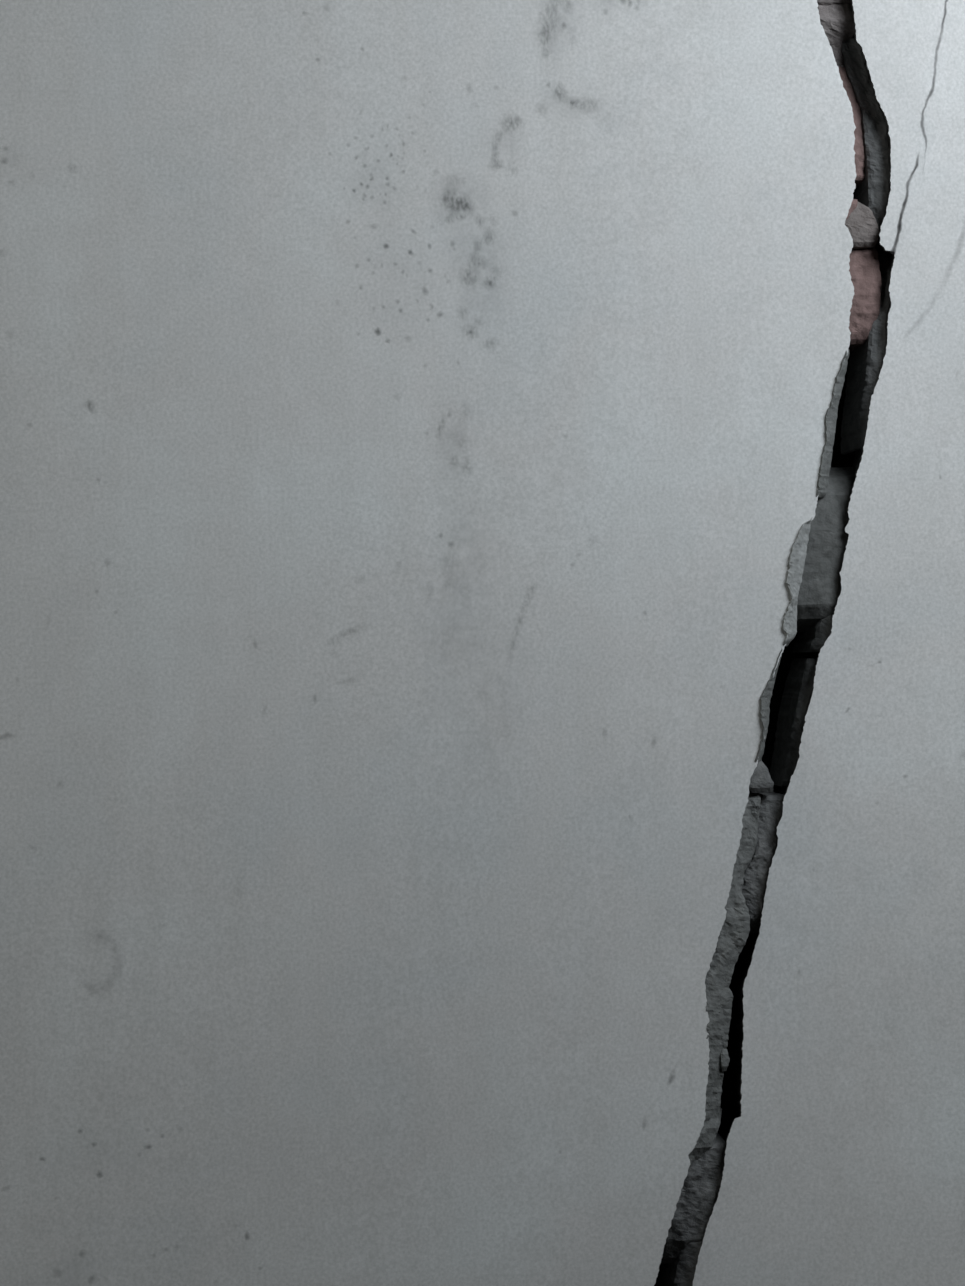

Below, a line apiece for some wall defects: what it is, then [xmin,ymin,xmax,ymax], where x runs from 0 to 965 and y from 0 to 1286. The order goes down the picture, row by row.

crack [654,0,918,1286]